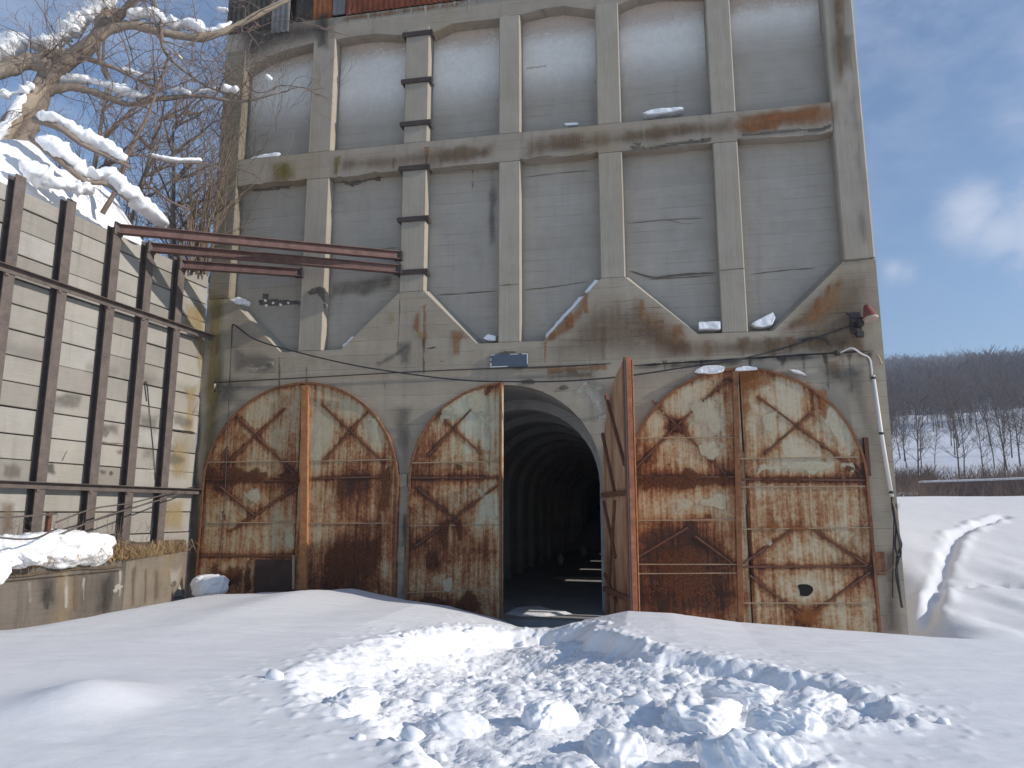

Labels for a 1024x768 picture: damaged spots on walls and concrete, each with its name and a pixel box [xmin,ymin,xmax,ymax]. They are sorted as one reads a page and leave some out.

corrosion [737,108,832,131]
corrosion [544,295,606,373]
corrosion [741,372,768,389]
corrosion [204,446,300,486]
corrosion [636,464,730,493]
corrosion [762,475,802,485]
corrosion [207,558,253,593]
corrosion [324,534,388,590]
corrosion [425,520,463,572]
corrosion [644,541,718,613]
corrosion [420,589,493,612]